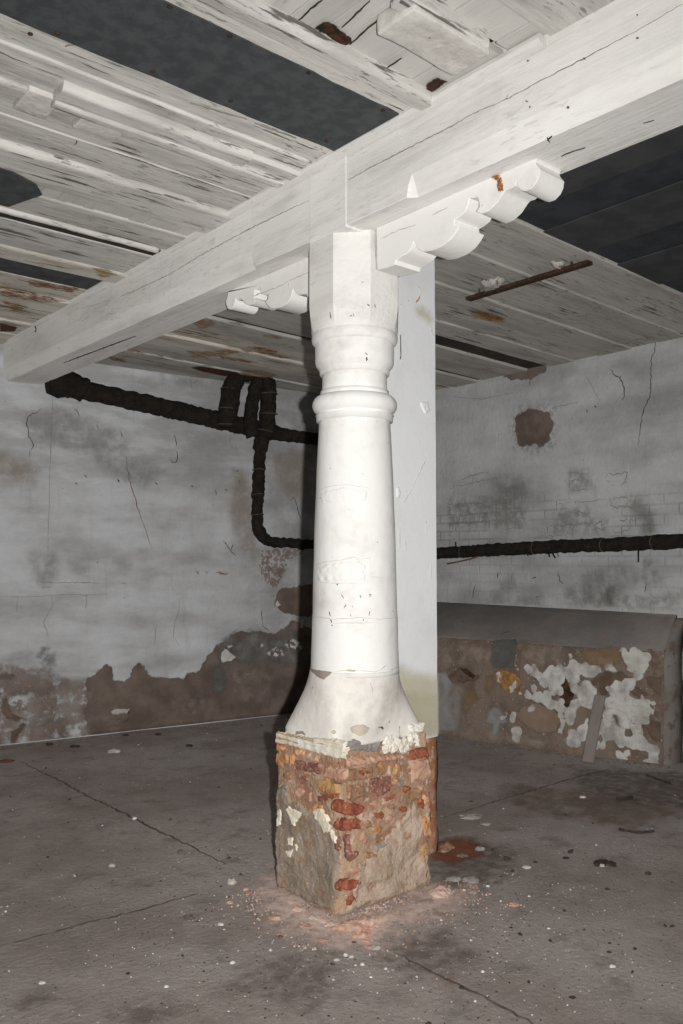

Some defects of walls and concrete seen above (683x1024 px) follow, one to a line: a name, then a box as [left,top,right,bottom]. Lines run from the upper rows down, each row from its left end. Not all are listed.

crack [349,4,683,180]
crack [375,208,450,270]
crack [26,397,53,527]
crack [76,410,150,543]
spalling [515,409,553,447]
crack [557,342,656,443]
flaking render [85,549,331,735]
peeling [0,674,65,739]
peeling [487,647,662,764]